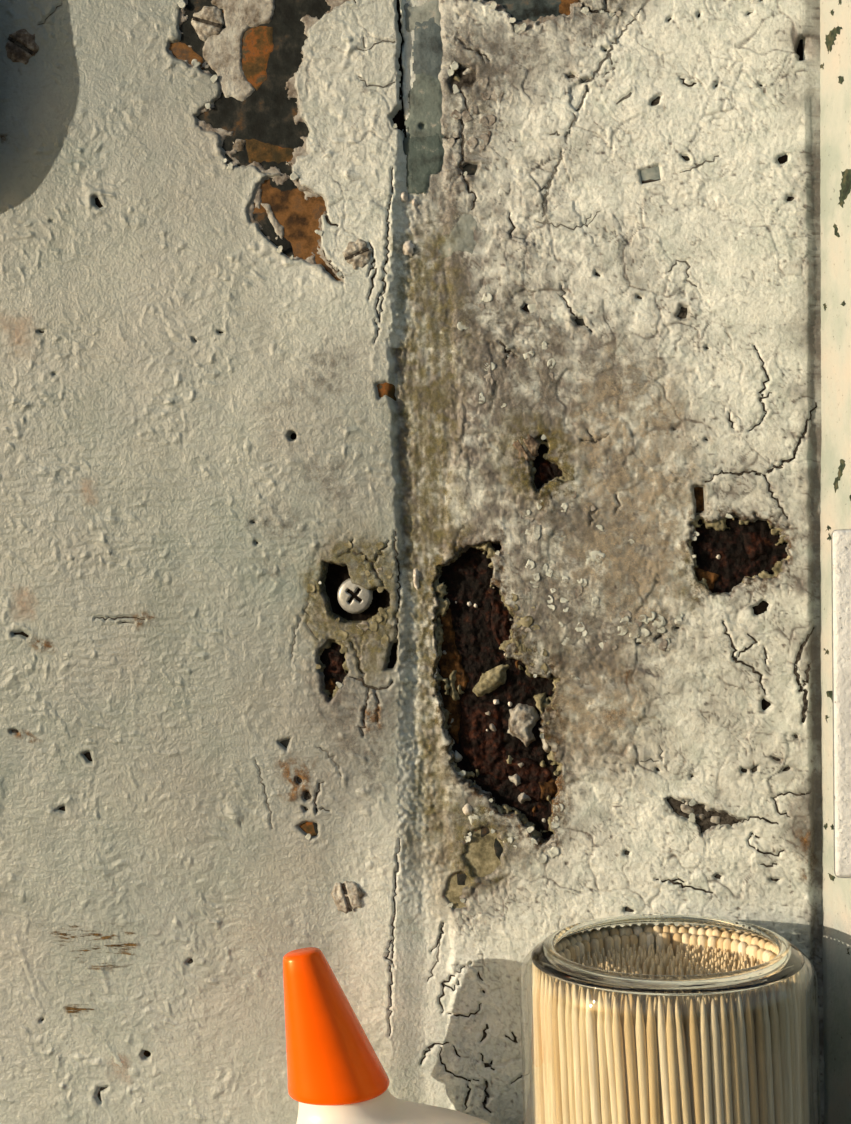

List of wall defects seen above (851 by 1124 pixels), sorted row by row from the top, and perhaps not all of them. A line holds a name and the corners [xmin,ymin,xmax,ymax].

peeling [468,0,634,33]
peeling [168,0,349,283]
peeling [392,0,504,194]
spalling [838,169,851,208]
crack [323,167,393,343]
rust [520,432,568,508]
crack [705,402,817,519]
rust [429,539,565,846]
crack [722,621,768,695]
crack [794,627,814,723]
peeling [666,797,744,833]
crack [420,923,534,1113]